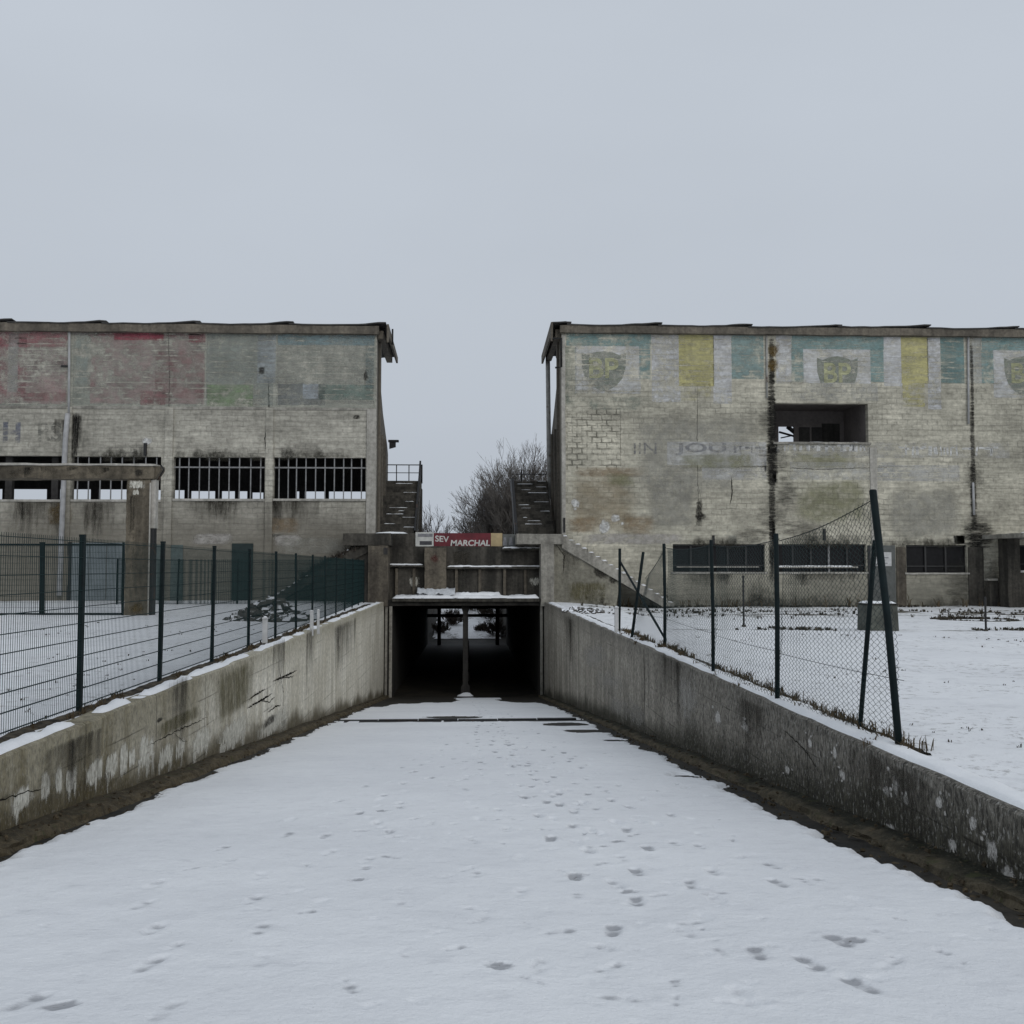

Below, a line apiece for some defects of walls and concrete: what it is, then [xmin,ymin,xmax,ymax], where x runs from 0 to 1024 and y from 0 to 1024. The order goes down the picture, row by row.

water stain [767,339,778,575]
water stain [964,346,991,547]
crack [249,668,297,722]
water stain [259,705,289,740]